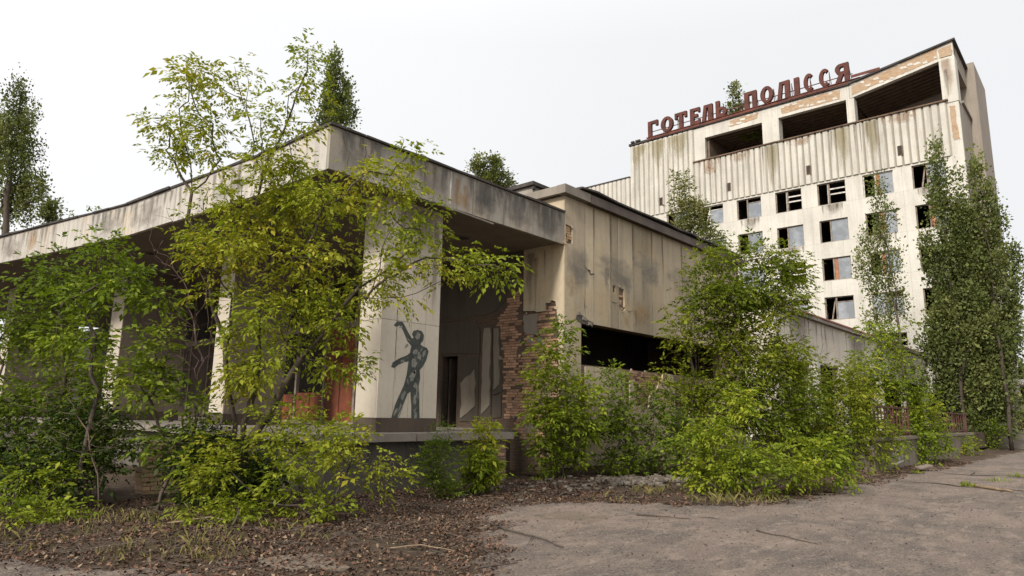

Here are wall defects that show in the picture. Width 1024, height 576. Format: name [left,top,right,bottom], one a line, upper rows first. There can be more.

spalling [850,44,952,87]
spalling [496,280,561,458]